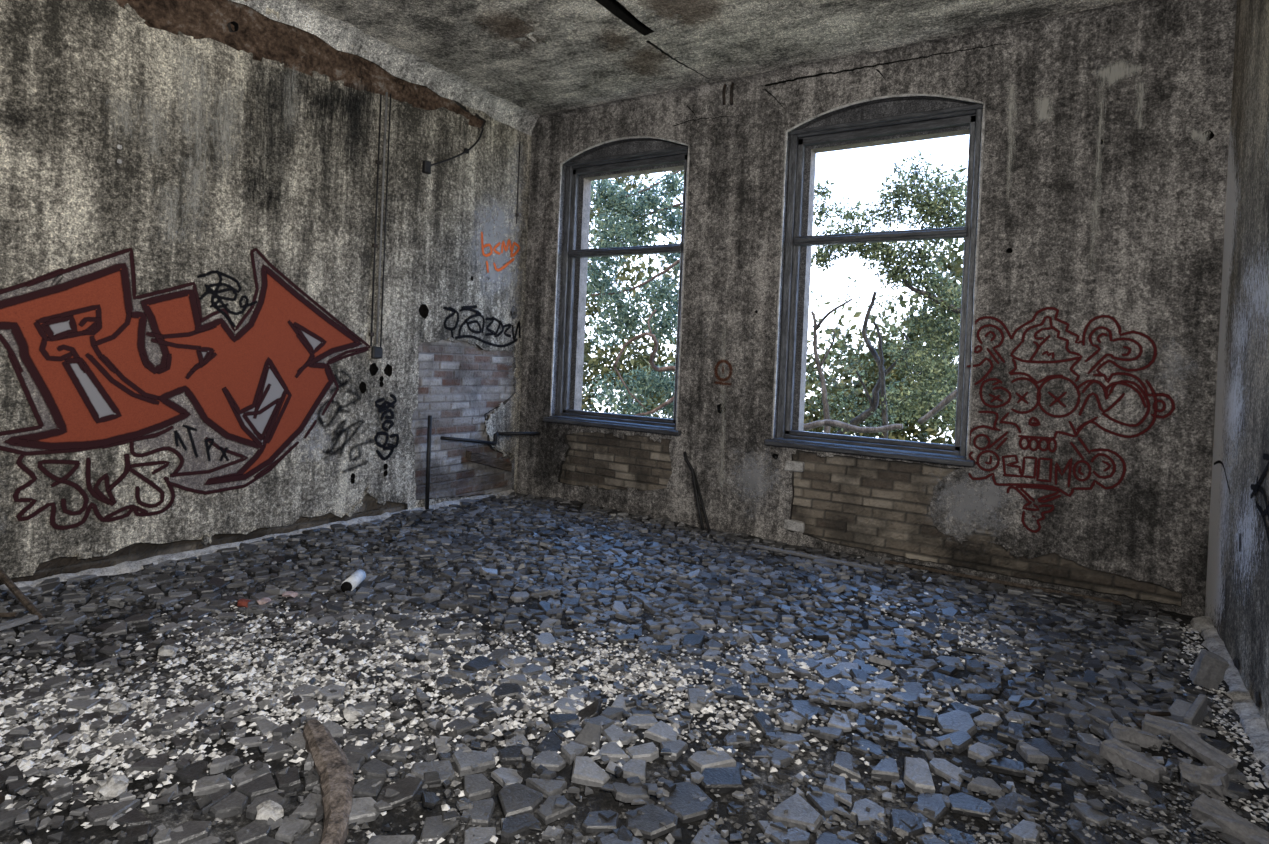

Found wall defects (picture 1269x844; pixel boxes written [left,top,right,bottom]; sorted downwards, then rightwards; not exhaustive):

leakage [248,74,293,203]
spalling [116,0,484,128]
leakage [307,87,368,162]
leakage [1099,62,1144,127]
spalling [0,337,519,585]